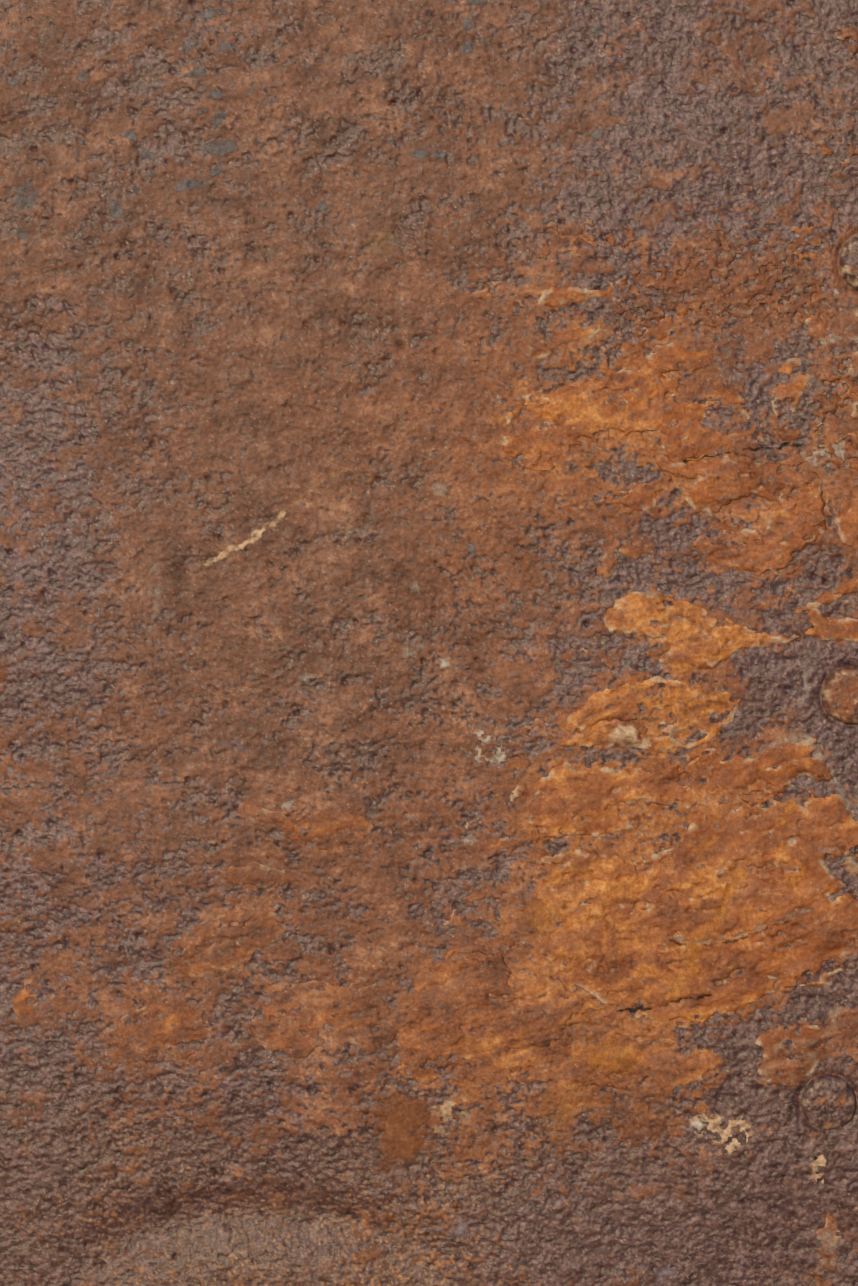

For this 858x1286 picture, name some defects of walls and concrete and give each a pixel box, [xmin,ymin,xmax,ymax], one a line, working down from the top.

rust [235,218,858,1162]
spalling [610,724,651,749]
rust [168,908,287,978]
rust [11,976,39,1029]
rust [99,1001,213,1070]